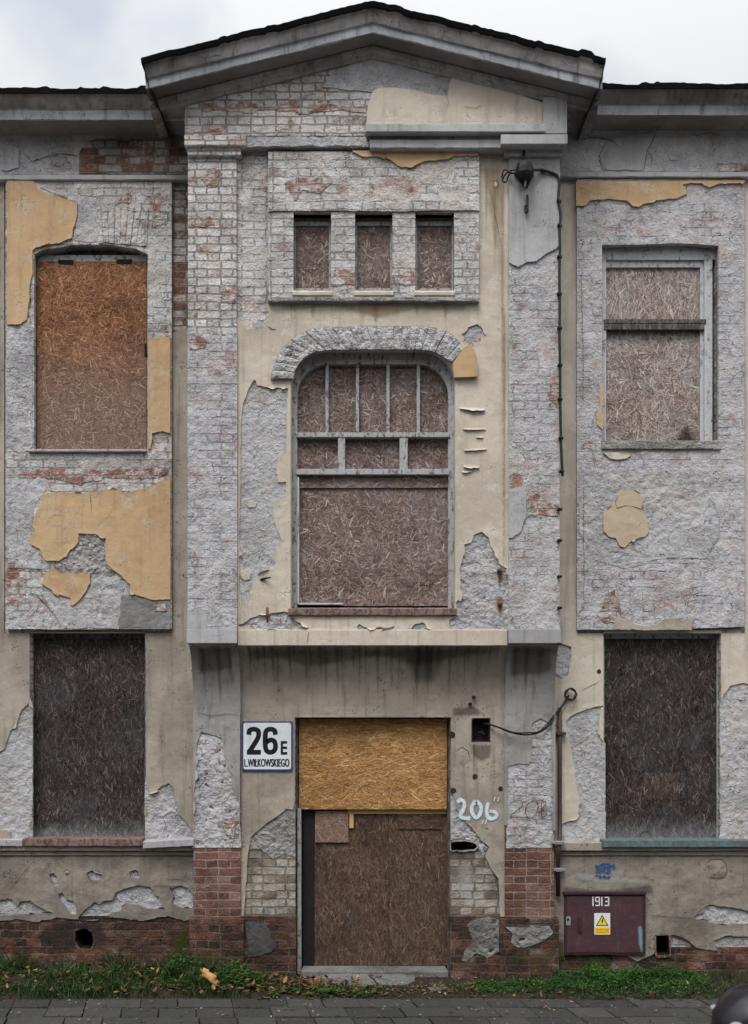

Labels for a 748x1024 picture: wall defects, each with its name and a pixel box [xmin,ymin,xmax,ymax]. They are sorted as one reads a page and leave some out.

flaking render [576,161,748,208]
flaking render [6,180,101,453]
flaking render [5,466,171,630]
flaking render [187,380,308,630]
flaking render [449,532,509,630]
flaking render [579,439,721,569]
flaking render [0,699,33,838]
flaking render [144,732,295,859]
flaking render [498,705,606,848]
flaking render [719,683,748,839]
flaking render [50,870,193,951]
spalling [462,917,553,962]